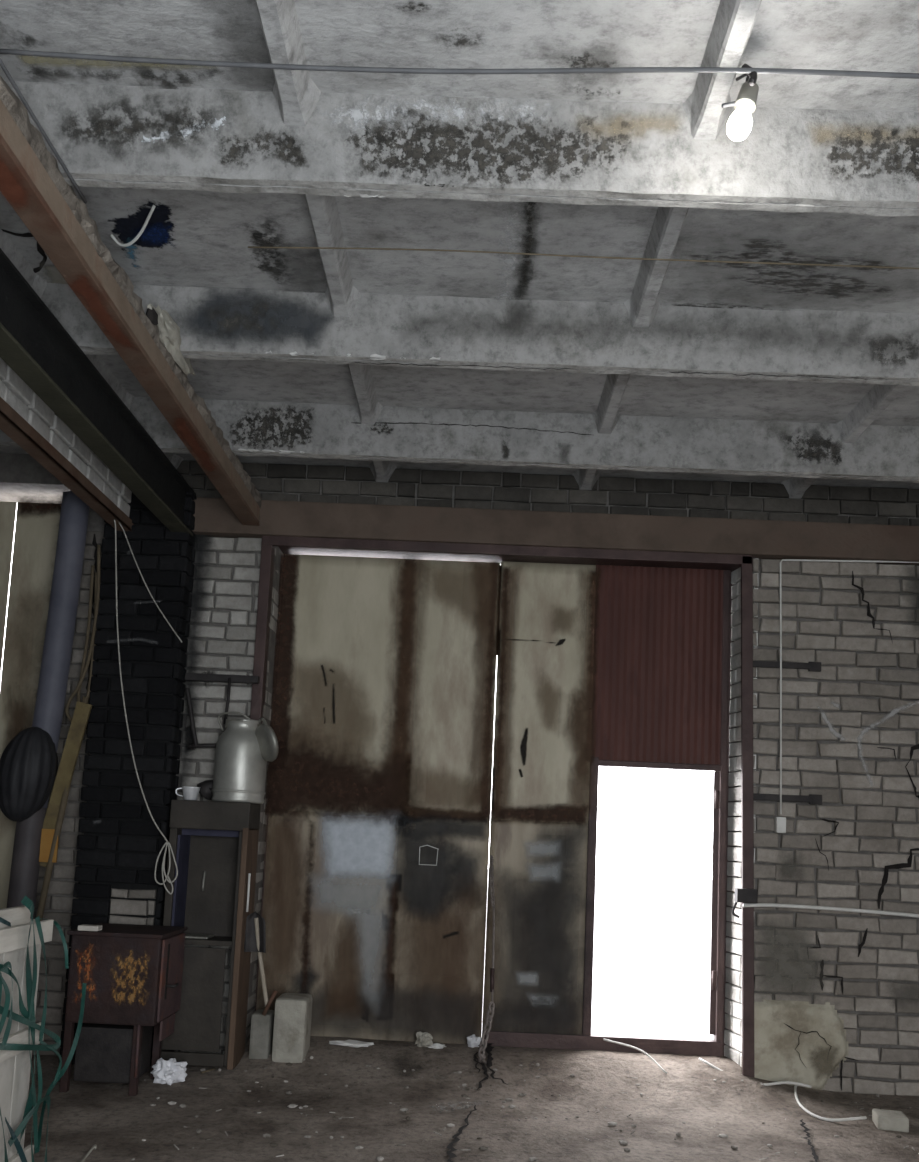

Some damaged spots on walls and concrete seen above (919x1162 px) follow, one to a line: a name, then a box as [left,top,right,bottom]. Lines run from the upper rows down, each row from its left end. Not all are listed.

damp [61,98,226,145]
damp [221,131,305,166]
damp [341,101,629,189]
damp [827,128,919,181]
damp [230,405,313,449]
crack [852,571,893,643]
rust [265,553,599,997]
crack [877,744,919,798]
crack [807,848,919,994]
rust [329,925,356,1012]
crack [447,1018,508,1162]
crack [800,1119,818,1162]